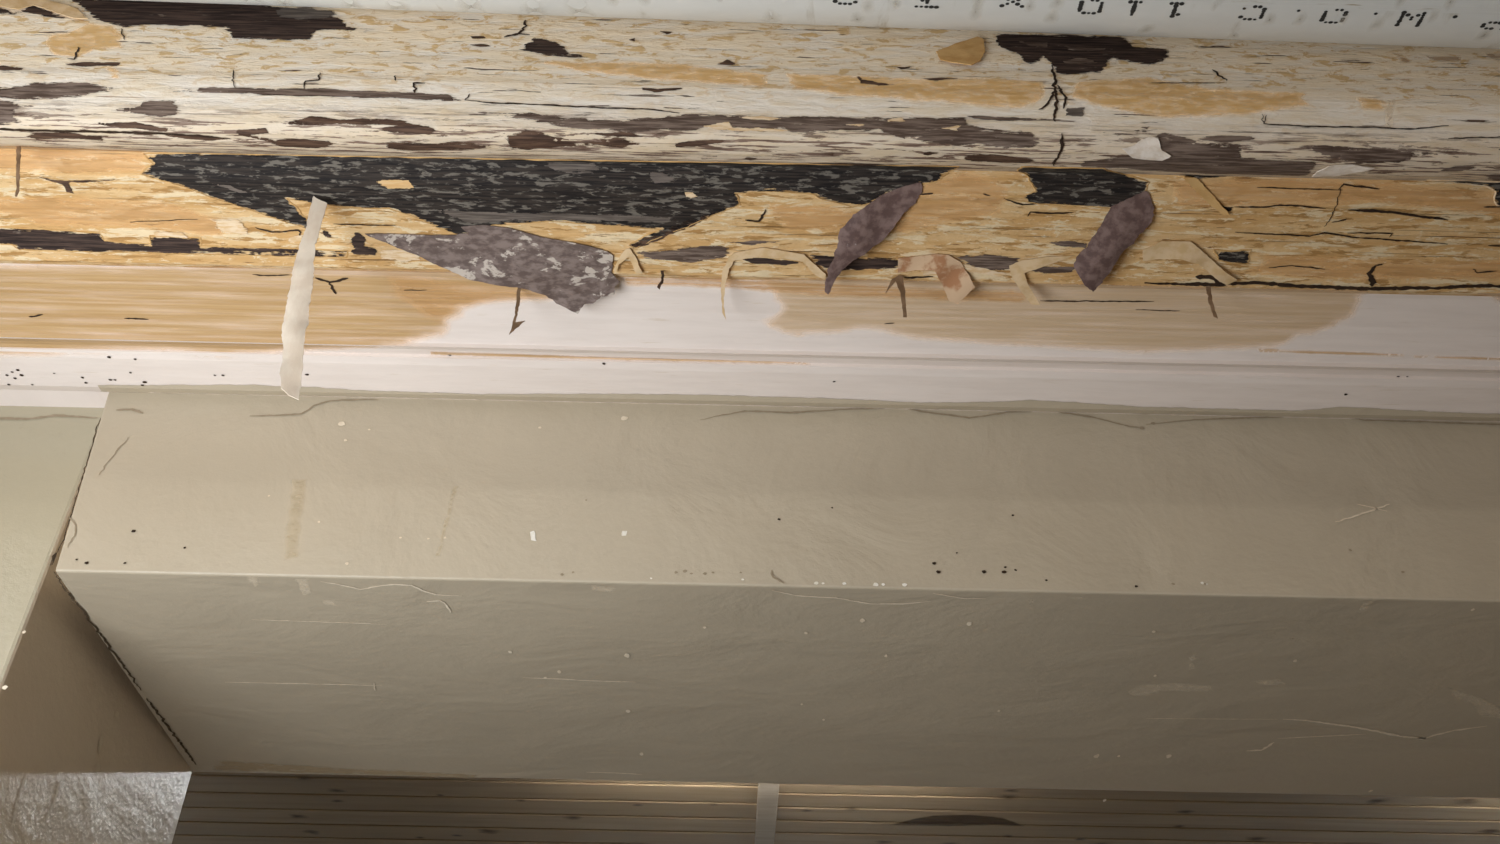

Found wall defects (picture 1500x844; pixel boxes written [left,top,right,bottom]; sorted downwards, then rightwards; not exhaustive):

peeling [0,0,357,40]
peeling [520,38,583,57]
peeling [897,34,1169,81]
crack [1039,65,1068,166]
peeling [0,62,1500,400]
crack [256,399,375,416]
crack [0,408,196,765]